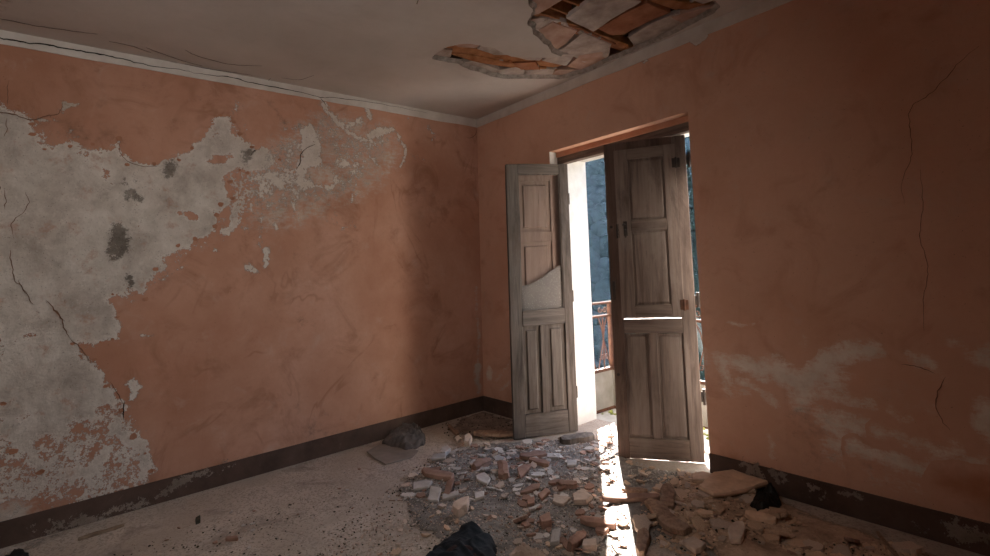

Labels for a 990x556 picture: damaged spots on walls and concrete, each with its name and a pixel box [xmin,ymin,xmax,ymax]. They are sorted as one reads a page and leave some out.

crack [0,81,63,136]
crack [0,19,421,112]
spalling [432,0,720,79]
crack [0,187,90,361]
peeling [0,96,424,535]
leakage [702,333,990,519]